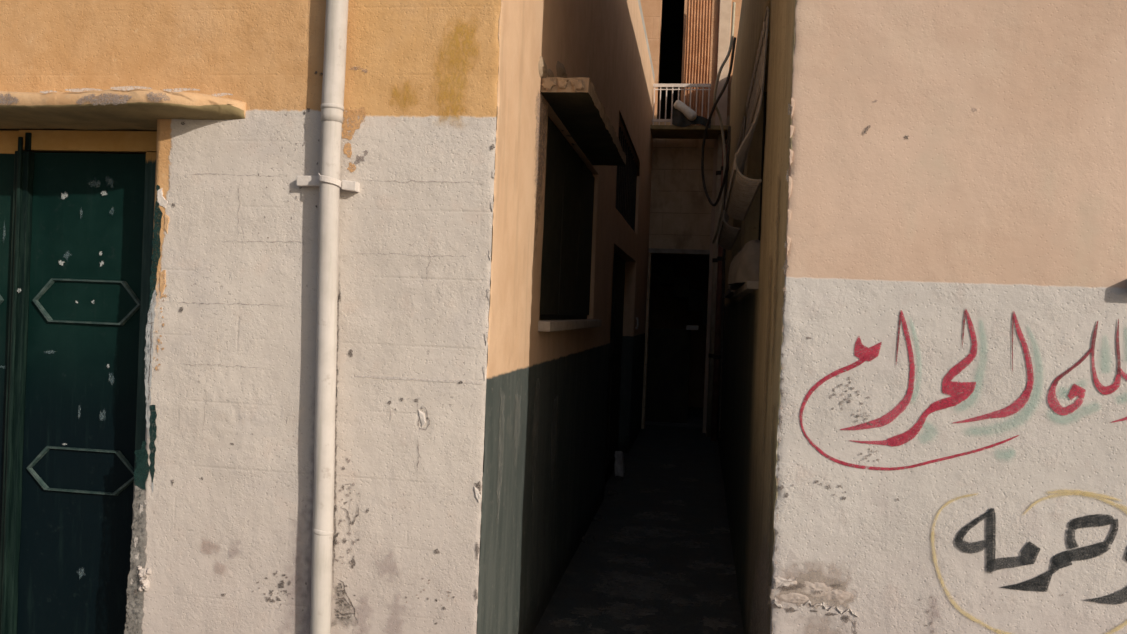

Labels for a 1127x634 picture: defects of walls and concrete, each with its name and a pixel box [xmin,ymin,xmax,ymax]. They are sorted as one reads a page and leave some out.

peeling [342,107,368,172]
peeling [157,188,175,234]
peeling [335,483,369,568]
peeling [252,570,307,606]
peeling [335,581,358,626]
spalling [770,530,857,623]